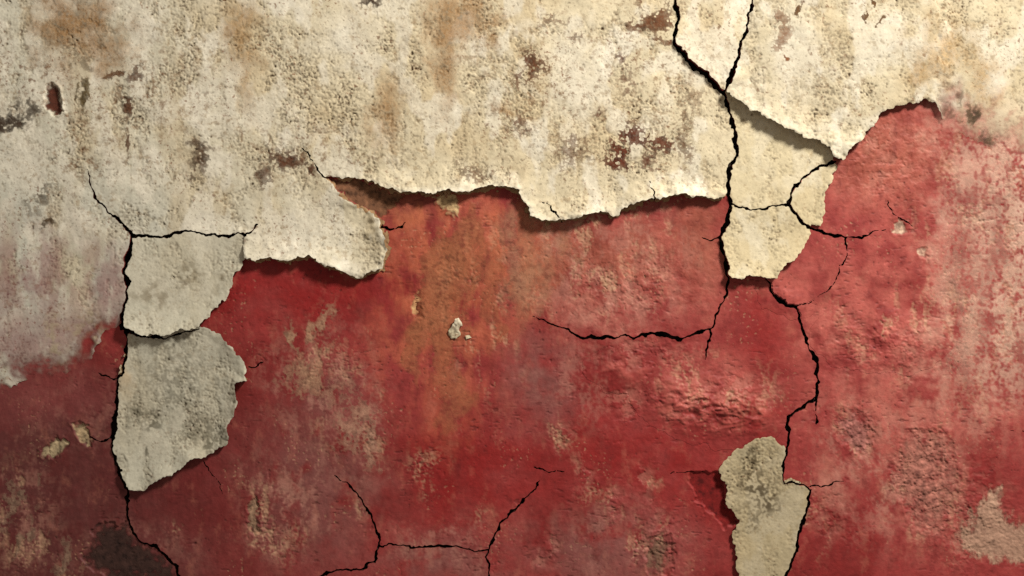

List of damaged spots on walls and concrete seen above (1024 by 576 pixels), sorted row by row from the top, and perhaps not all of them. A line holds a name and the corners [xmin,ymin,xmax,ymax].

flaking render [676,0,1024,279]
flaking render [0,0,736,491]
crack [533,0,907,576]
crack [96,197,258,576]
flaking render [84,524,173,576]
crack [320,467,556,576]
flaking render [690,436,809,576]
peeling [899,433,954,528]
peeling [961,487,1024,564]